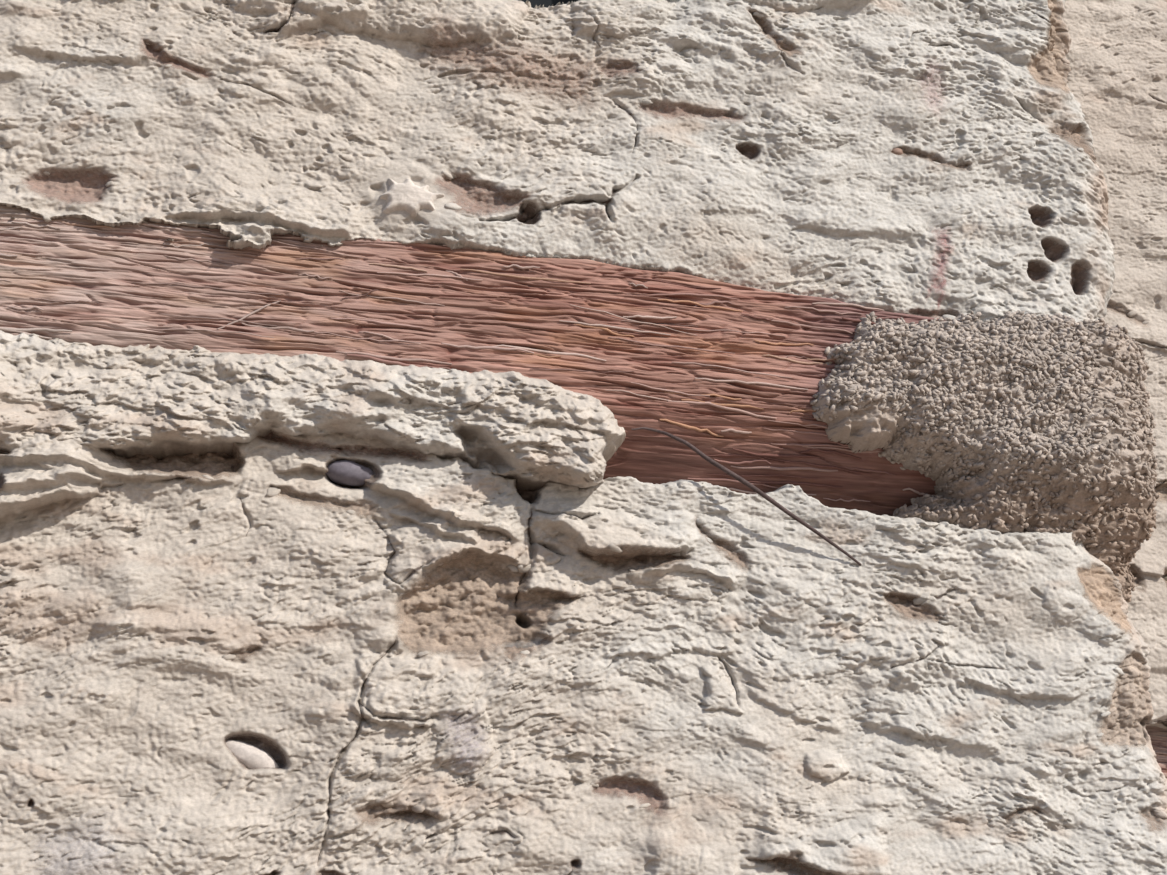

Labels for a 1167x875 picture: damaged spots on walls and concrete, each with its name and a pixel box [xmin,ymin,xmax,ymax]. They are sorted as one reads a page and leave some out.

crack [269,1,295,32]
crack [481,180,634,222]
crack [318,640,432,861]